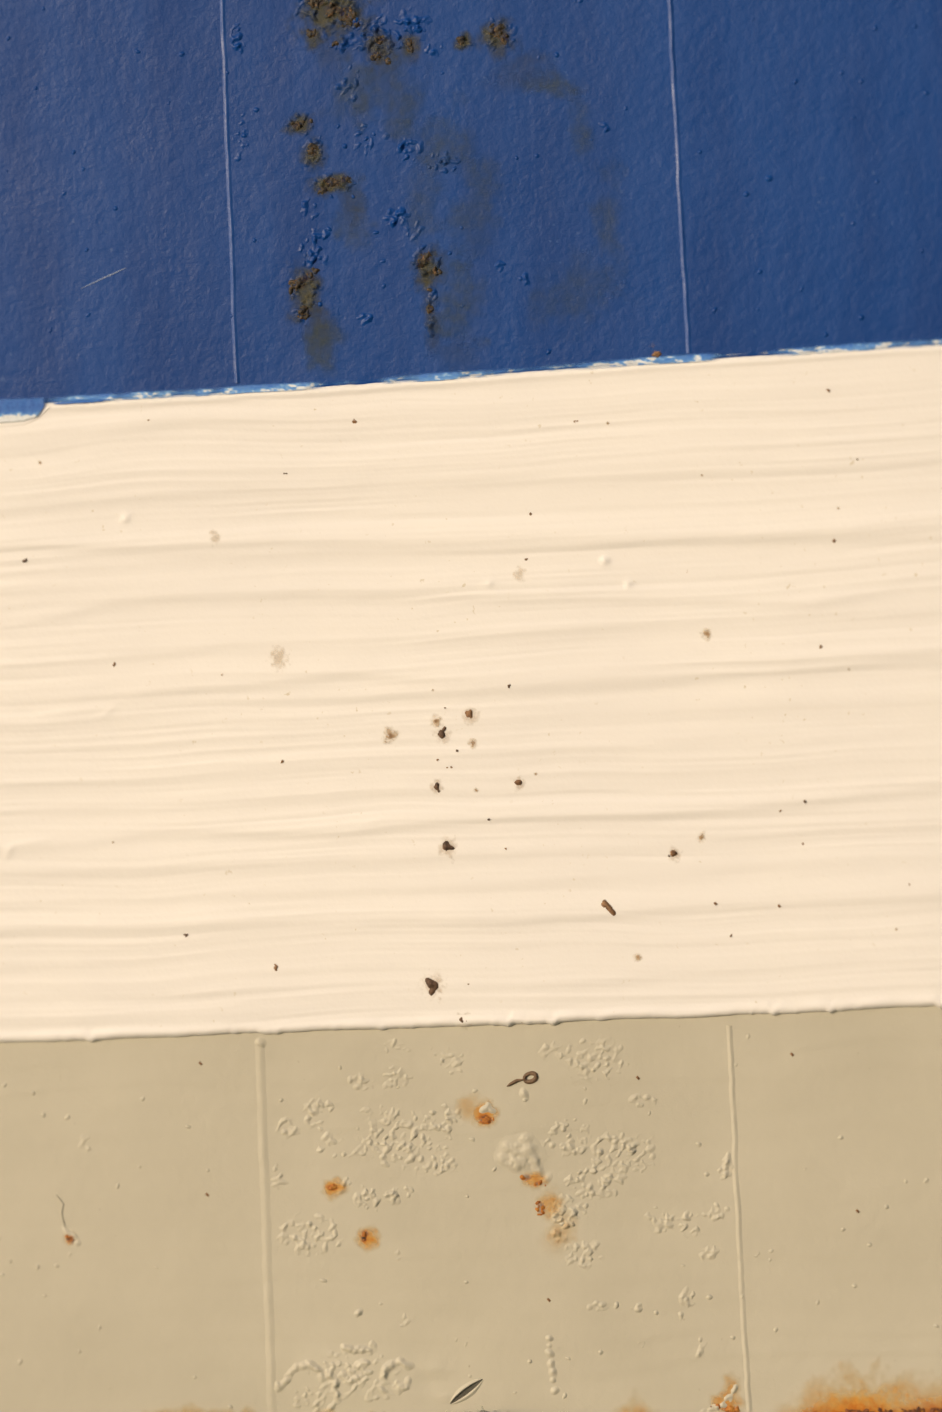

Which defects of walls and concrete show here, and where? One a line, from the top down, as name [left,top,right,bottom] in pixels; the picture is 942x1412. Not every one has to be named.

corrosion [303,0,360,47]
corrosion [369,35,415,65]
corrosion [456,23,509,49]
corrosion [289,116,351,194]
corrosion [288,267,320,320]
corrosion [417,252,442,314]
corrosion [474,1105,494,1124]
corrosion [325,1182,344,1195]
corrosion [520,1174,554,1216]
corrosion [359,1230,377,1247]
corrosion [710,1385,740,1412]
corrosion [802,1387,942,1412]